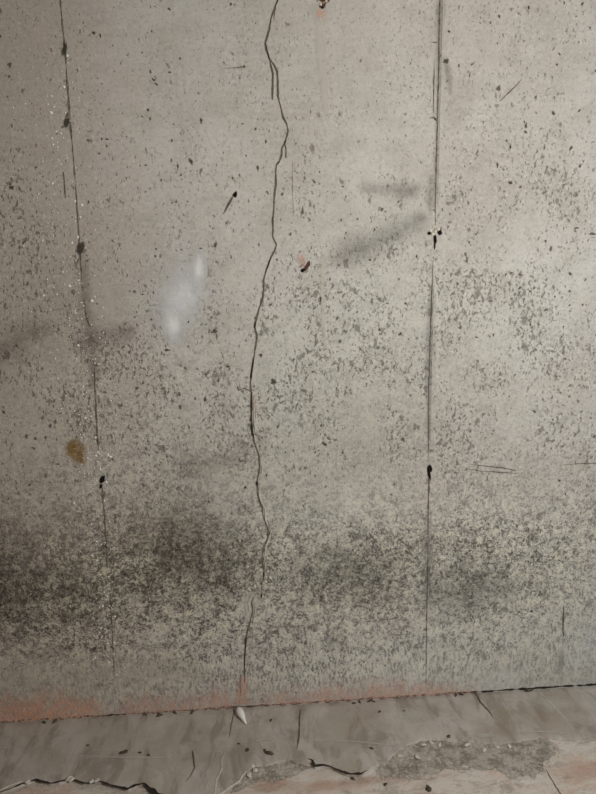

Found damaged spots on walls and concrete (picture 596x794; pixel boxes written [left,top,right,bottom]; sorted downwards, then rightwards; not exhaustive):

crack [230,0,289,732]
spalling [230,762,313,792]
spalling [376,738,559,781]